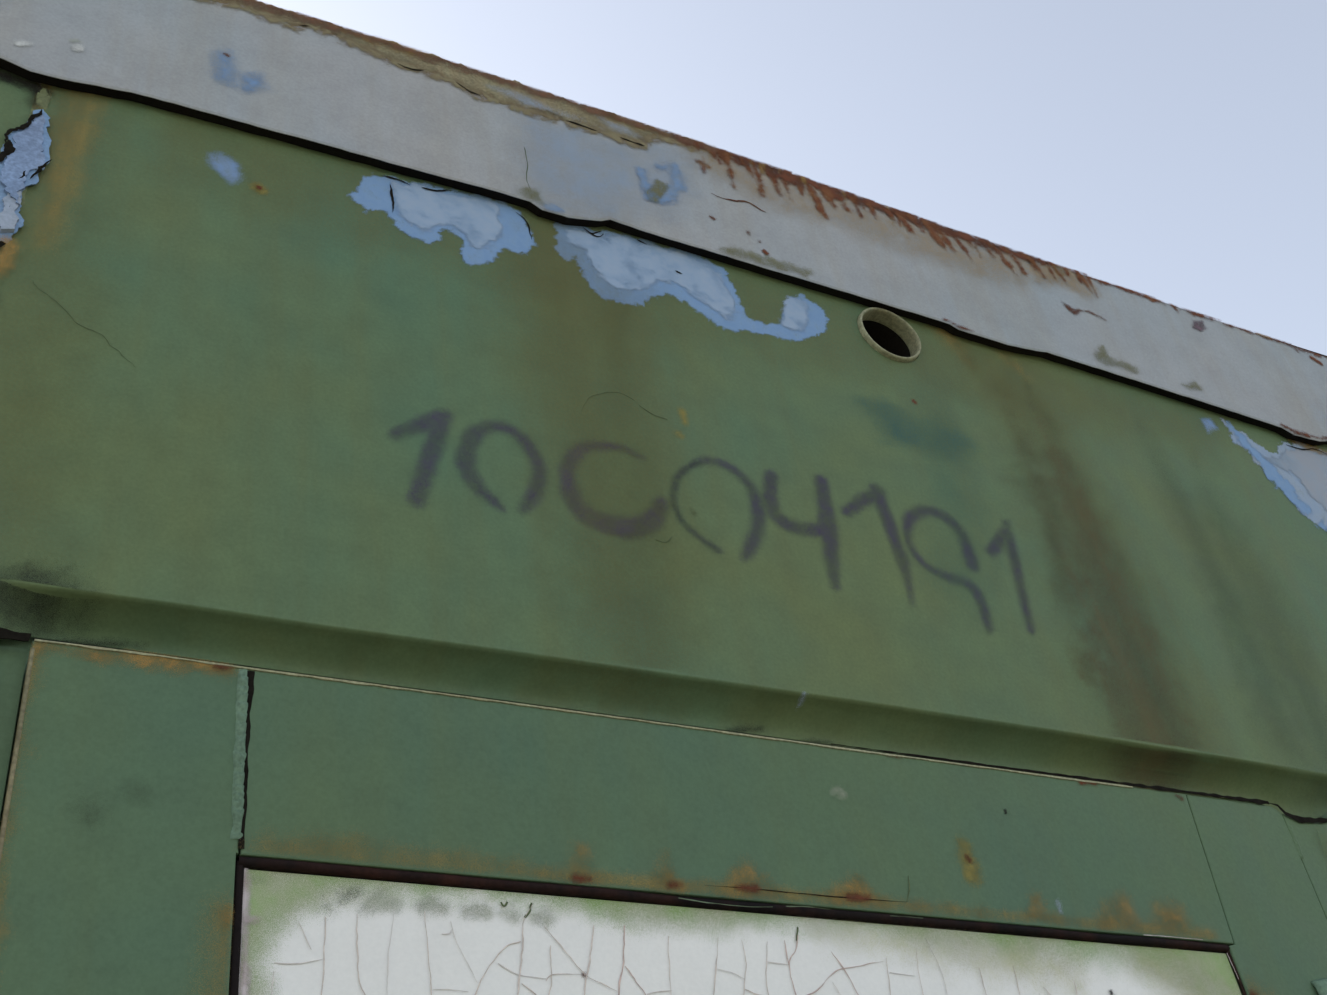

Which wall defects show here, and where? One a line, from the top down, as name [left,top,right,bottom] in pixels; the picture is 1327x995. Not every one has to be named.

peeling [0,109,52,243]
rust [239,0,1327,371]
peeling [349,175,829,342]
water stain [130,104,1242,472]
peeling [1201,417,1327,531]
crack [271,903,672,995]
crack [713,927,948,995]